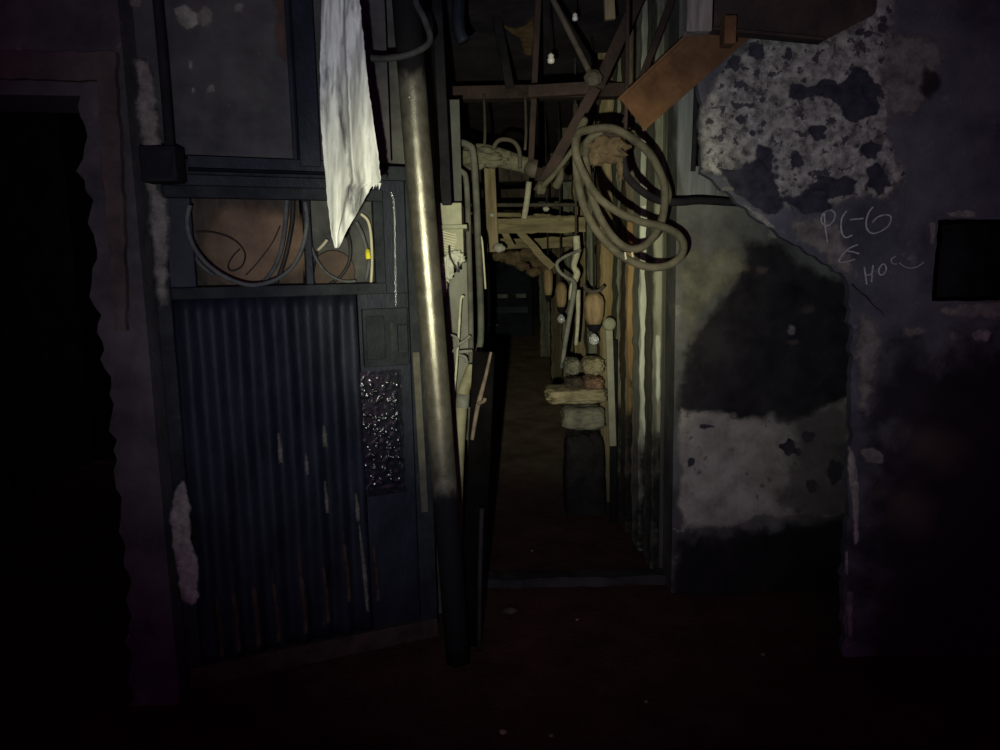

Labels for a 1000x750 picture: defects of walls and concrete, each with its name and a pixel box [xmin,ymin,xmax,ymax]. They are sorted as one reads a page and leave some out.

peeling [700,0,945,275]
water stain [680,249,744,324]
spalling [169,482,199,605]
flaking render [677,398,884,575]